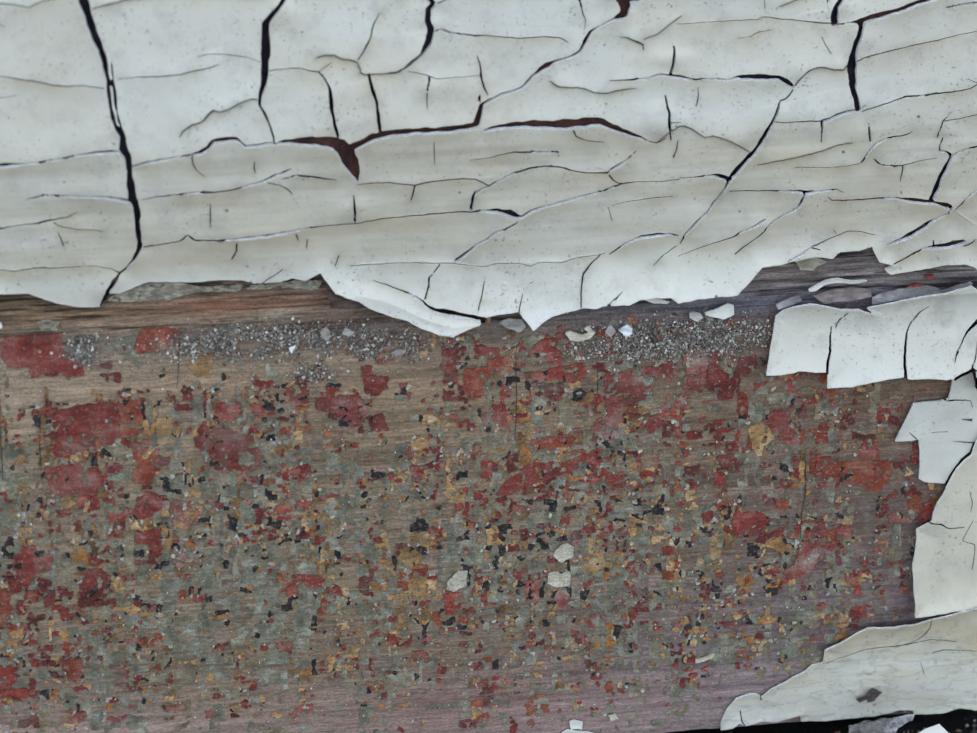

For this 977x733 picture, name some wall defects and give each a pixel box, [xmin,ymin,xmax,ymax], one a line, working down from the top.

crack [0,0,977,323]
peeling [796,257,827,271]
crack [826,313,848,372]
crack [903,307,928,380]
crack [910,320,977,485]
peeling [0,274,977,733]
crack [799,449,807,538]
crack [930,494,975,570]
crack [826,620,971,675]